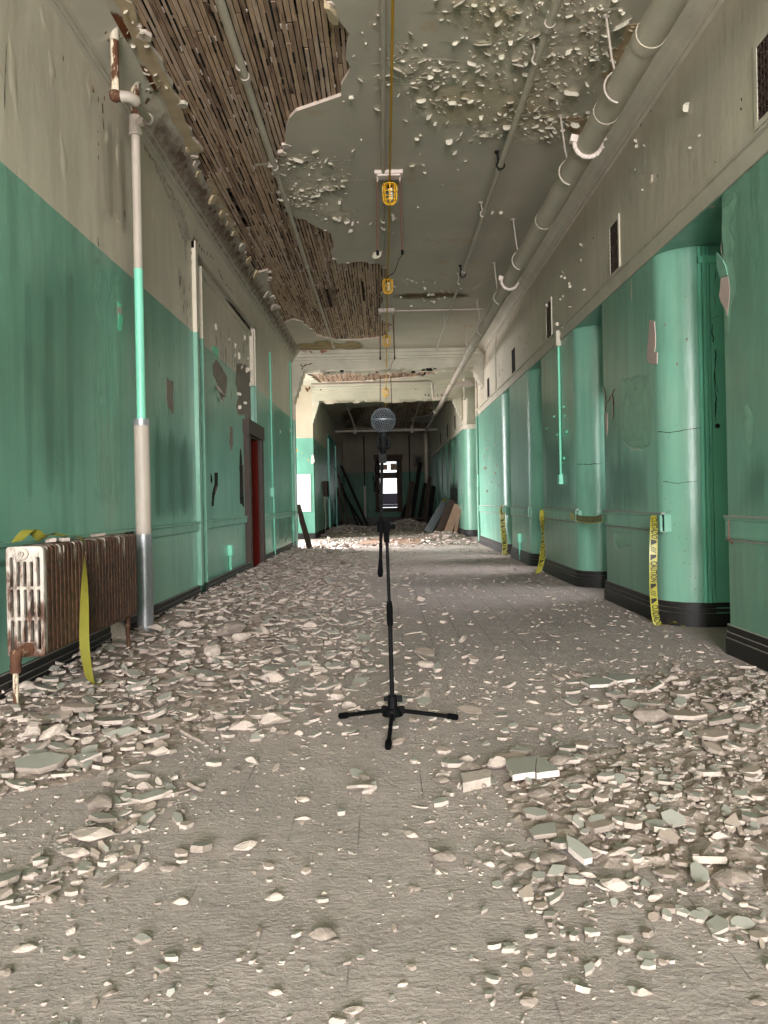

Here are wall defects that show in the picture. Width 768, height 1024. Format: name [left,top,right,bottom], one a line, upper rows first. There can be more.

flaking render [114,0,638,353]
peeling [716,198,737,334]
peeling [647,320,666,365]
peeling [166,377,174,414]
peeling [212,346,253,420]
flaking render [305,367,457,429]